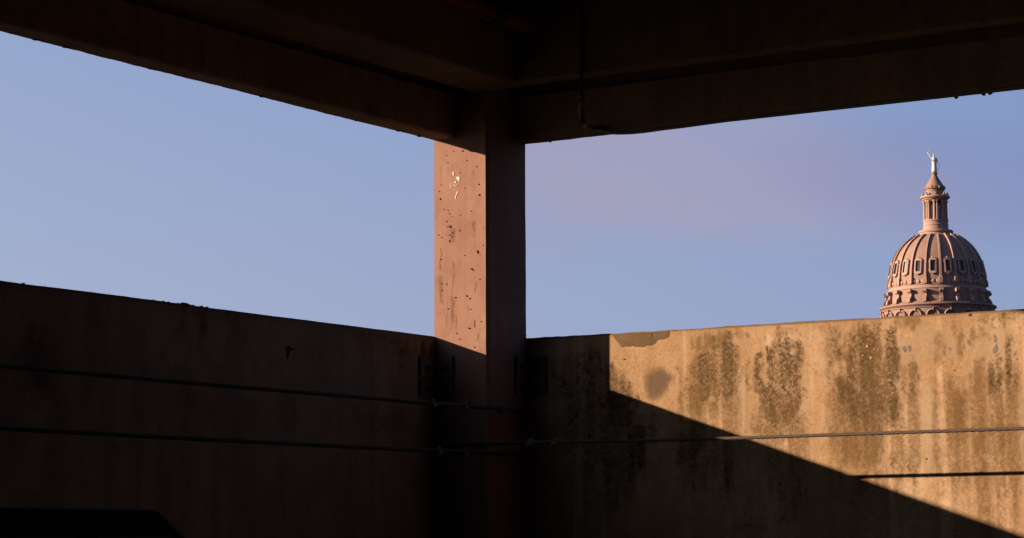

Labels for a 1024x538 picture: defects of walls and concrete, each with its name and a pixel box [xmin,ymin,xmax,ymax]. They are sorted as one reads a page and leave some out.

peeling [612,331,669,360]
water stain [553,327,807,514]
water stain [825,311,1024,512]